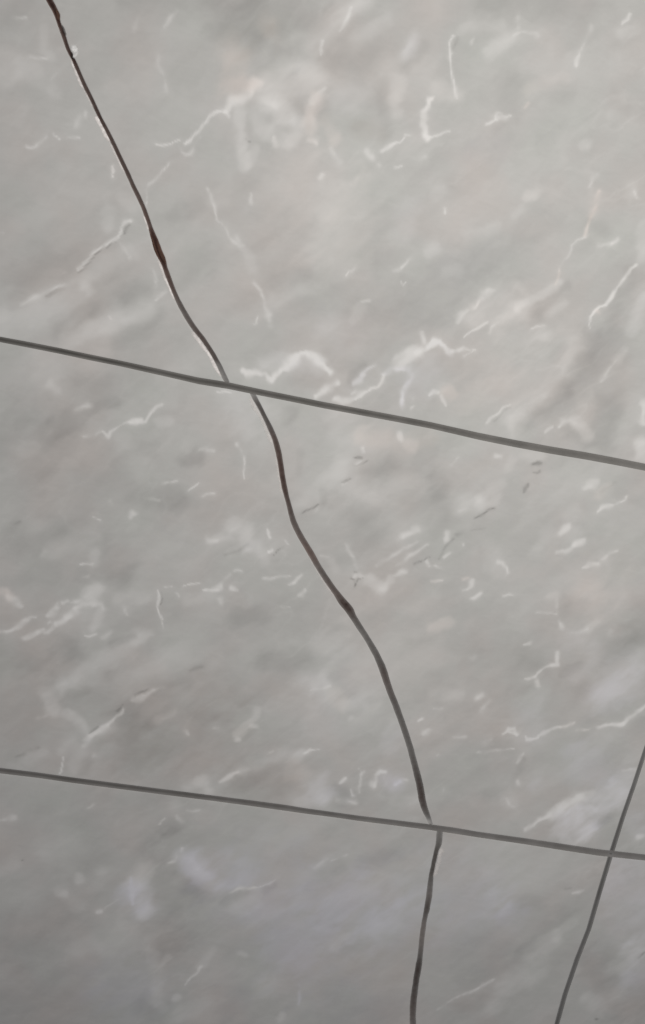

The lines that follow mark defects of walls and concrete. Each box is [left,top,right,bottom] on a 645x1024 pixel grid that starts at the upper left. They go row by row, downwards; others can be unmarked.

crack [46,0,229,382]
crack [250,394,443,1024]